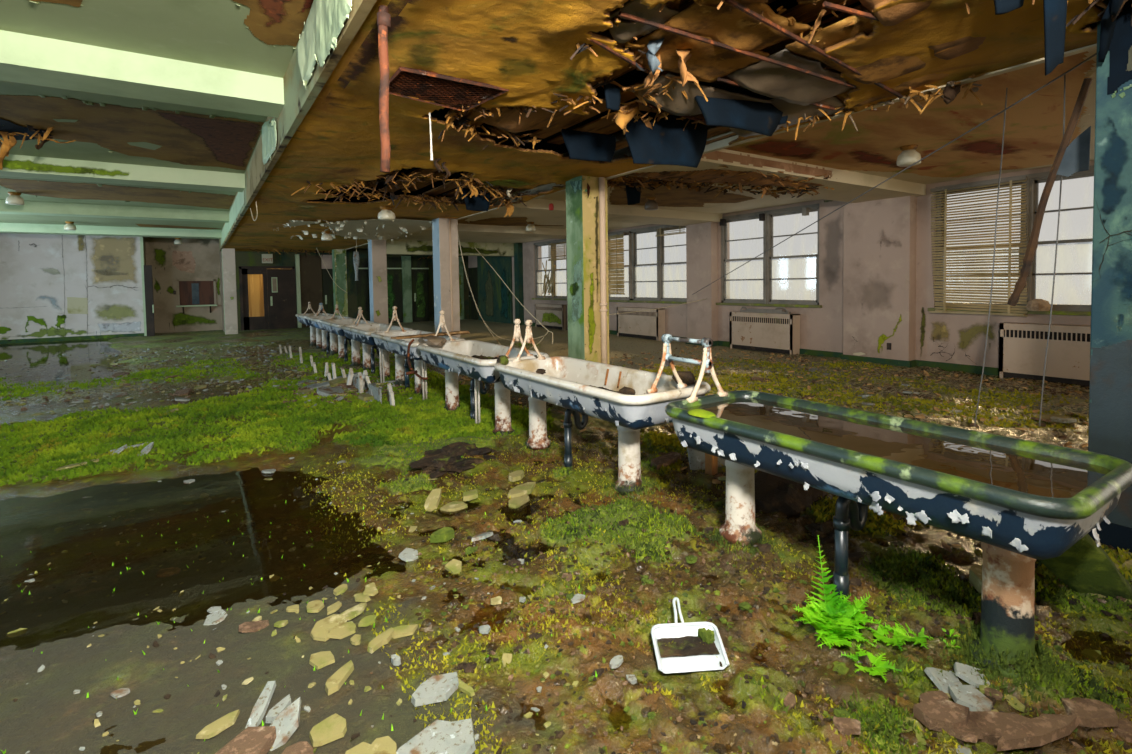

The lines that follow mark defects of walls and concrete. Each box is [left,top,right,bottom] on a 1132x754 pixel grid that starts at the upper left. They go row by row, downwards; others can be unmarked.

peeling [233,0,352,88]
corrosion [327,0,418,96]
peeling [0,95,277,170]
peeling [608,0,1132,207]
peeling [0,178,245,246]
leakage [78,235,135,282]
leakage [97,305,140,332]